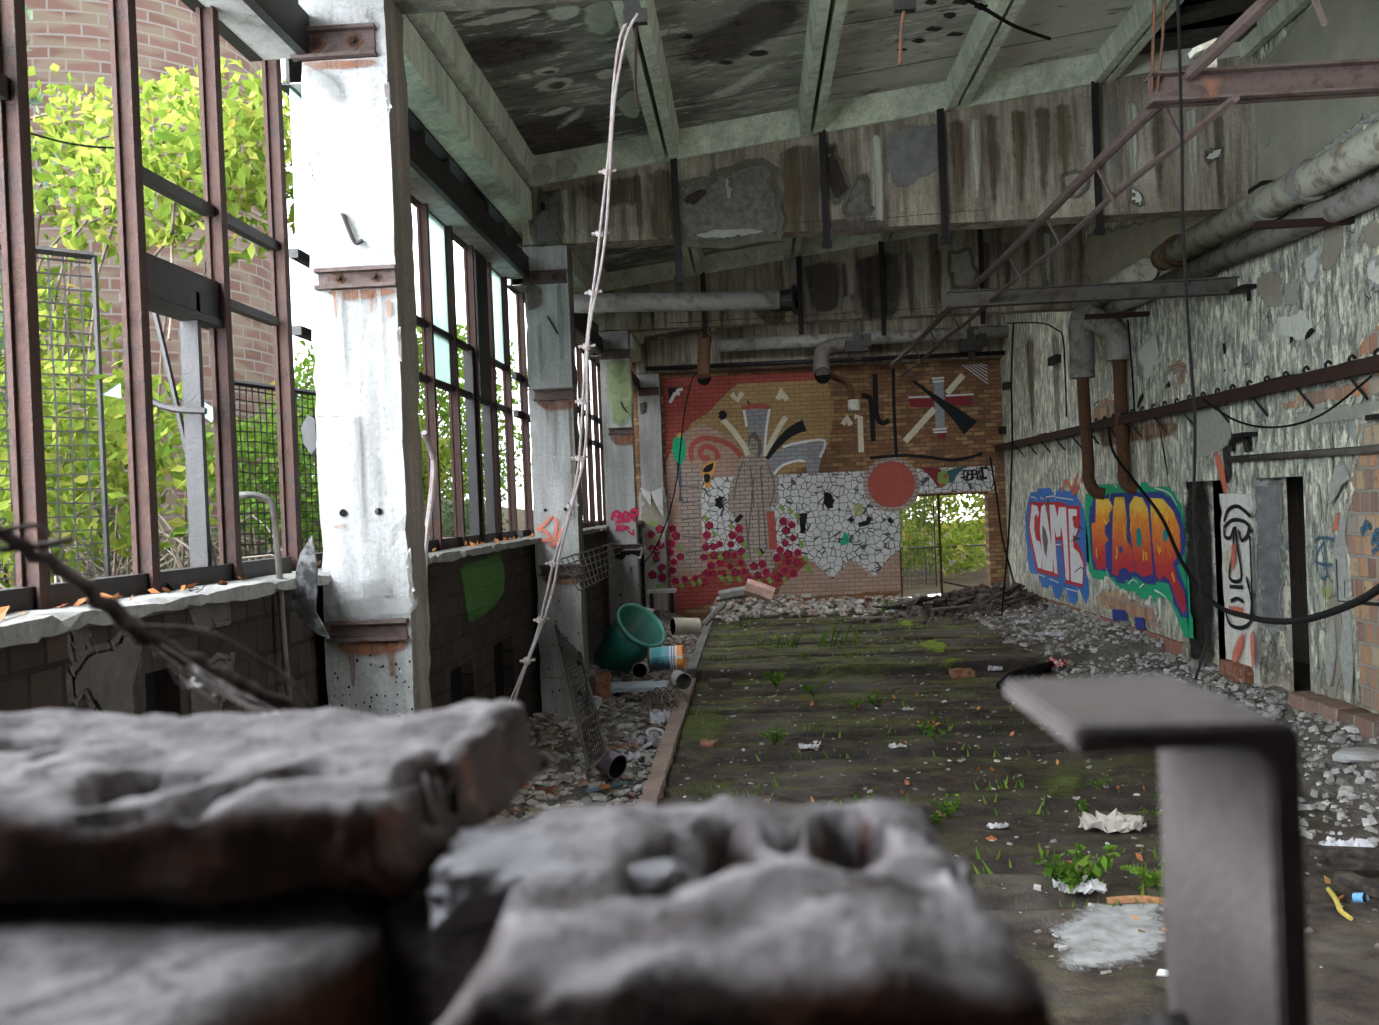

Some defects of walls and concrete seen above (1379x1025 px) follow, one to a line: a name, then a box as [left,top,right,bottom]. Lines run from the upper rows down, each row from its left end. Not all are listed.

water stain [462,1,617,35]
water stain [533,66,574,92]
water stain [711,63,778,98]
water stain [540,107,584,128]
water stain [780,104,1071,234]
spalling [671,158,784,249]
peeling [1363,254,1379,292]
rust [329,289,393,320]
peeling [1275,304,1317,346]
rust [1100,422,1177,446]
flaking render [1281,321,1379,714]
rust [339,641,408,686]